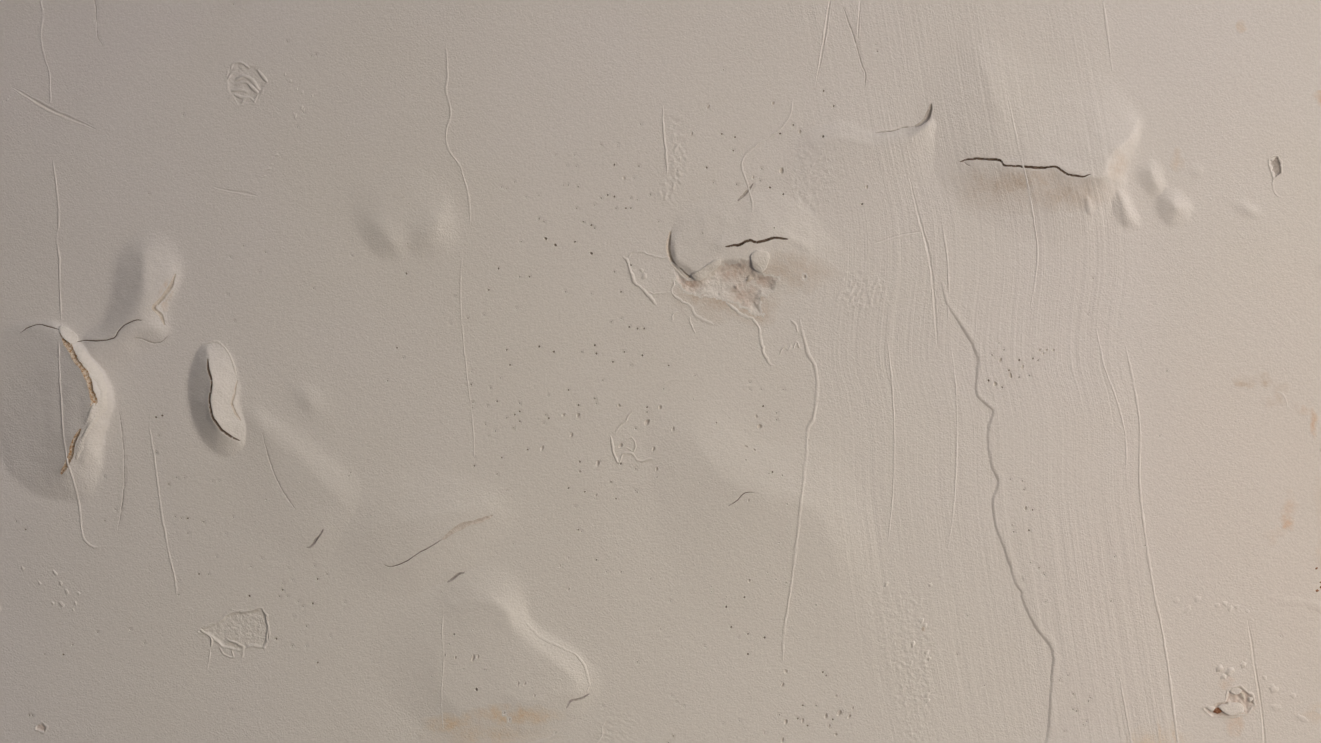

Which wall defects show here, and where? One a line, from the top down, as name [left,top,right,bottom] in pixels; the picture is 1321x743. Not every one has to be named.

peeling [197,607,271,670]